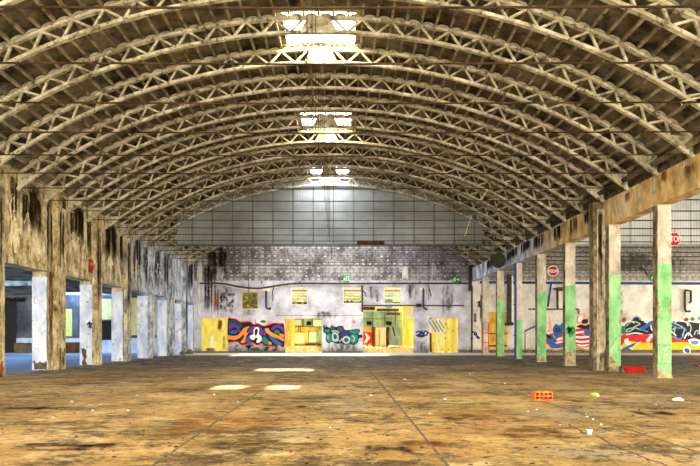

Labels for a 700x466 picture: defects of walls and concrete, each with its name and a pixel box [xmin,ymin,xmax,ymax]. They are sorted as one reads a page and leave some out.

damp [0,177,169,290]
damp [186,248,233,336]
peeling [608,353,619,372]